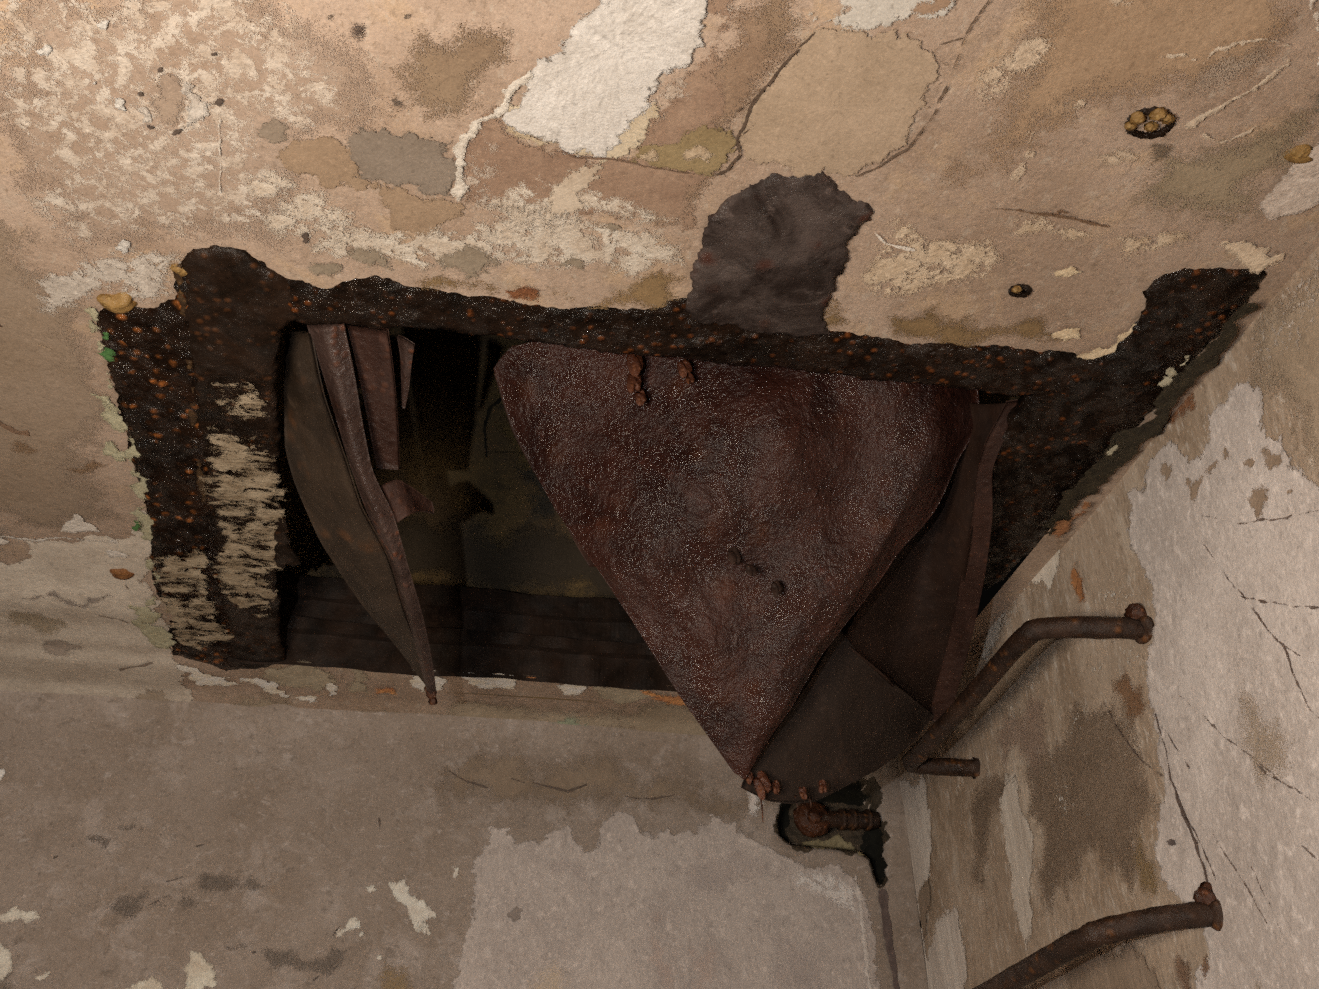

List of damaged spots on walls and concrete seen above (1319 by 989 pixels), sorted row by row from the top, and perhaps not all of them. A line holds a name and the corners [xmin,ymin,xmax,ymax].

peeling [0,0,955,317]
crack [855,0,990,177]
damp [411,274,539,296]
corrosion [505,284,540,303]
damp [553,268,686,310]
damp [883,304,1063,347]
corrosion [1008,284,1032,298]
peeling [1044,254,1319,989]
crack [1204,511,1319,716]
spalling [737,776,890,989]
corrosion [1170,953,1210,989]
crack [1104,696,1310,933]